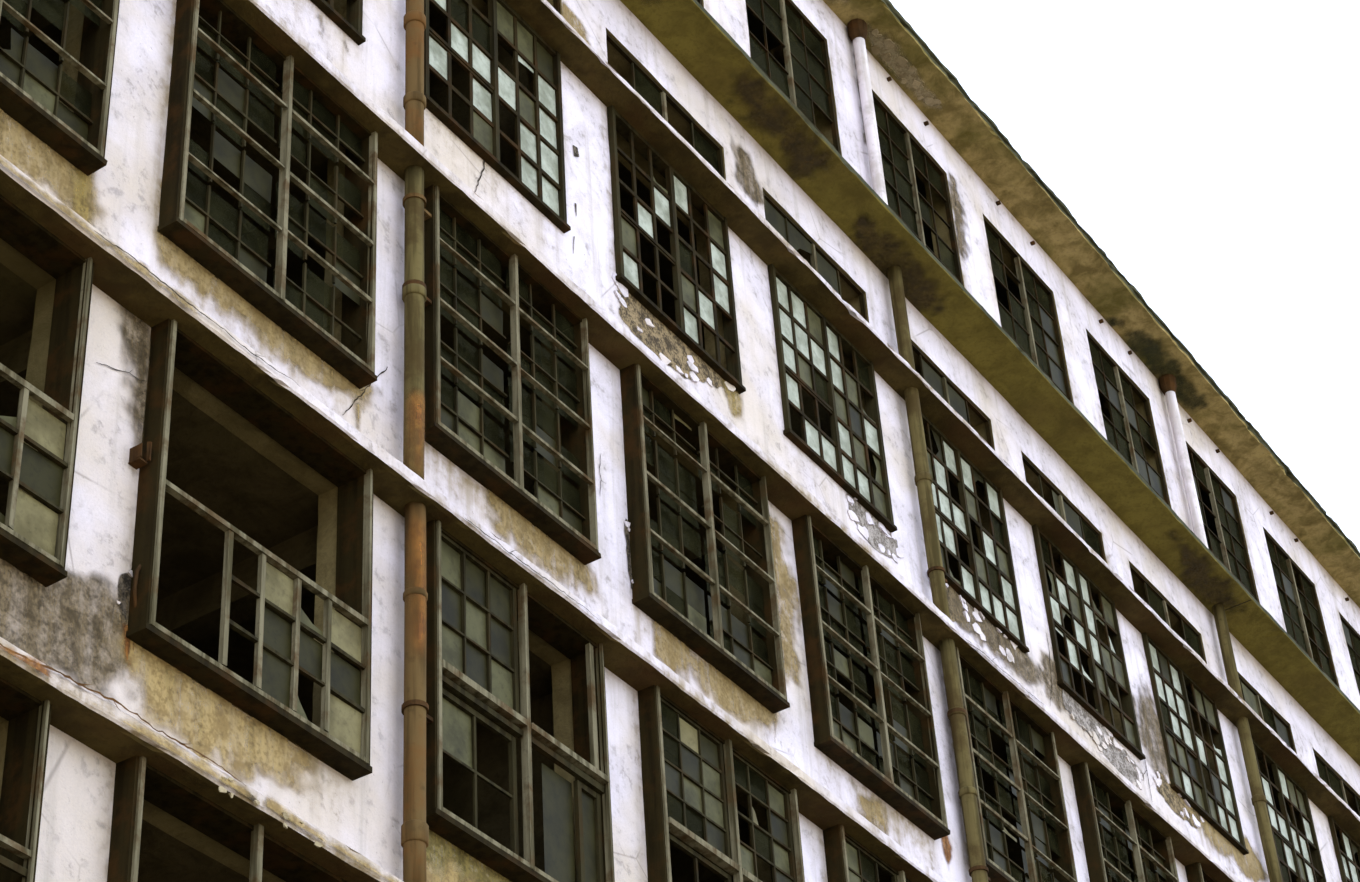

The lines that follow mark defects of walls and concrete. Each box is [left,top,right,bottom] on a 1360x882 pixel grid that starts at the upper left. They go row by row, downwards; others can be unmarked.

damp [948,173,968,258]
damp [855,217,943,312]
spalling [612,272,736,392]
crack [343,367,388,415]
rust [411,396,425,463]
spalling [847,493,904,564]
rust [411,523,426,648]
damp [769,515,800,684]
peeling [946,583,1017,663]
damp [119,636,315,795]
peeling [1062,690,1205,828]
damp [267,799,399,882]